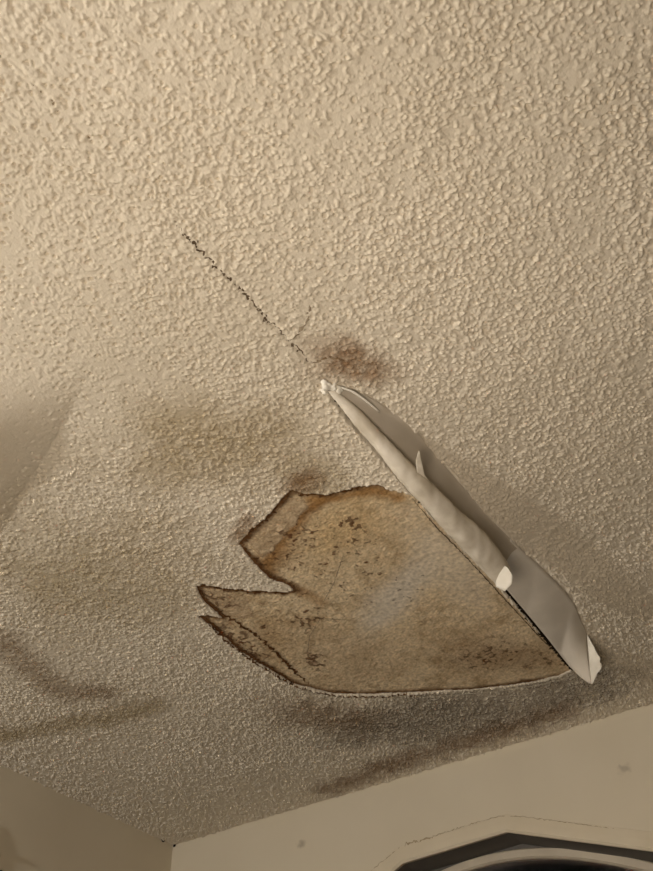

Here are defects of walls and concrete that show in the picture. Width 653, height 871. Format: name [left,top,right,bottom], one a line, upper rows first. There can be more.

peeling [416,451,430,482]
peeling [197,485,571,699]